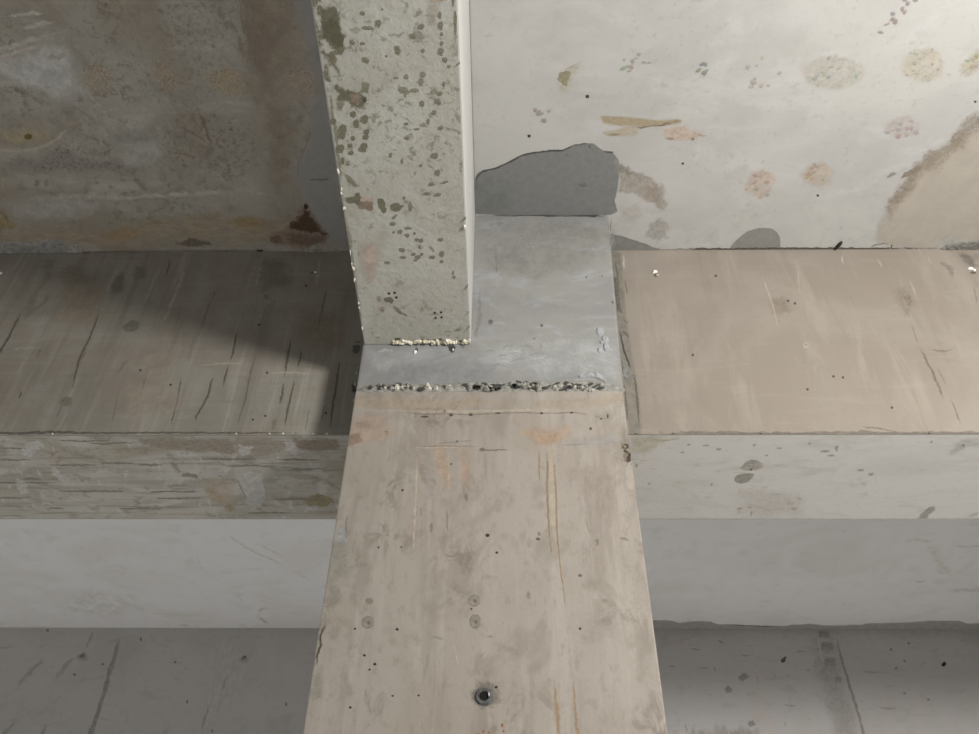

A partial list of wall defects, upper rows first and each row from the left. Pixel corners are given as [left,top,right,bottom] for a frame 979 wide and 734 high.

flaking render [474,143,660,250]
leakage [874,112,979,277]
crack [0,311,23,353]
crack [71,304,101,391]
crack [171,332,256,428]
crack [279,340,302,424]
crack [330,362,340,428]
crack [88,640,120,734]
crack [836,638,865,734]